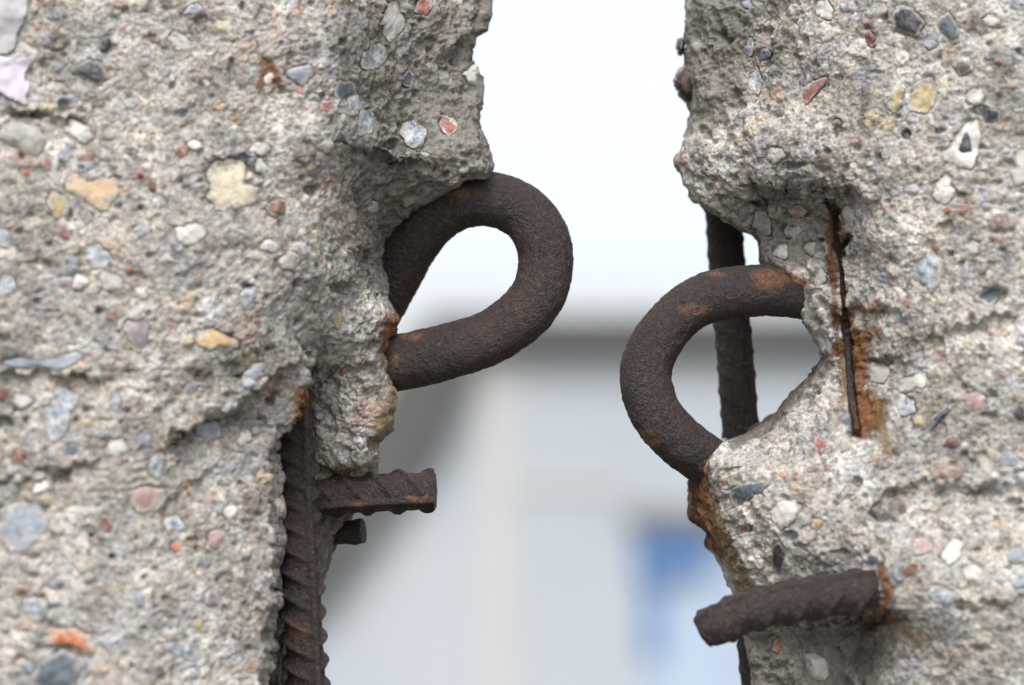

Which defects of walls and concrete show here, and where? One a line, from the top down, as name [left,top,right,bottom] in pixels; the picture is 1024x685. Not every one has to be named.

crack [824,198,860,437]
corrosion [825,211,892,456]
corrosion [688,463,750,592]
corrosion [854,562,921,685]